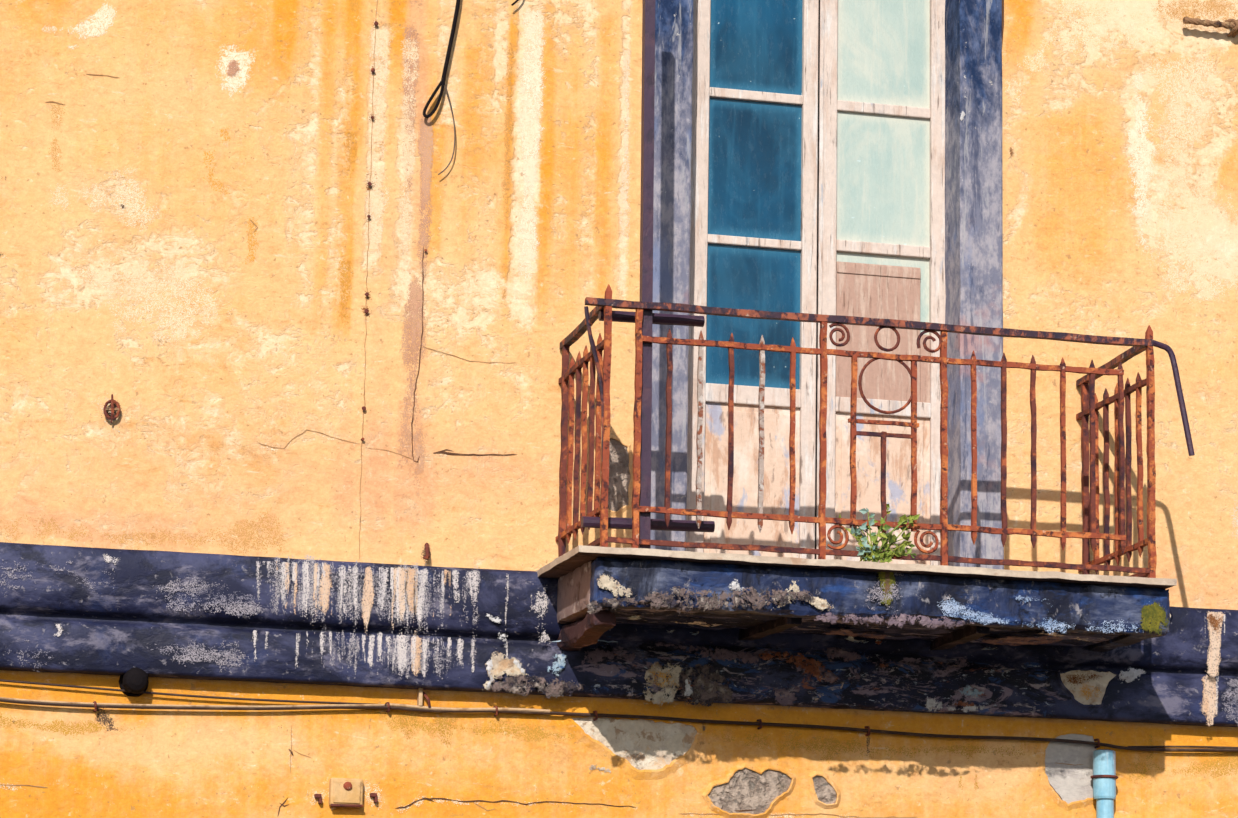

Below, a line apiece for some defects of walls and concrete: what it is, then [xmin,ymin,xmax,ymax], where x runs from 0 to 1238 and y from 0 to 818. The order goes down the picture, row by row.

water stain [338,259,353,325]
crack [258,0,518,558]
water stain [344,25,434,501]
water stain [2,505,479,677]
spalling [483,613,733,780]
spalling [581,575,1144,683]
water stain [1201,611,1225,726]
crack [395,796,633,814]
spalling [701,762,841,818]
spalling [1037,727,1103,811]